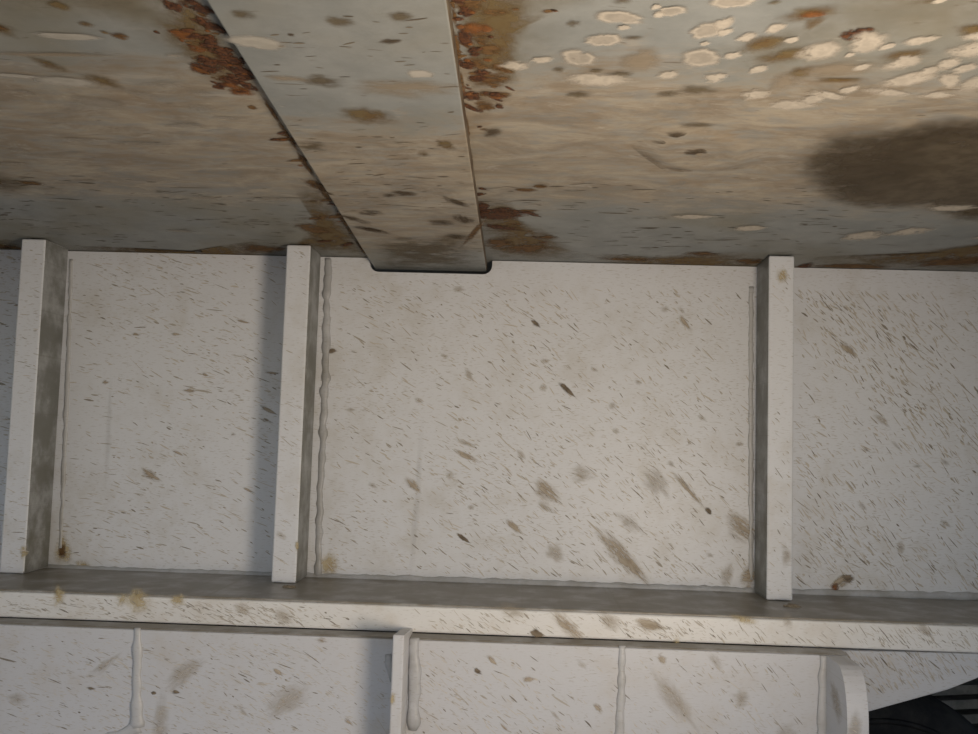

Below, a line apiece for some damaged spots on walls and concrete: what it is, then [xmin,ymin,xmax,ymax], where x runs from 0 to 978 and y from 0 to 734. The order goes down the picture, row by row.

rust [450,0,528,136]
rust [154,0,384,254]
leakage [813,126,978,216]
rust [385,188,560,263]
leakage [843,228,932,240]